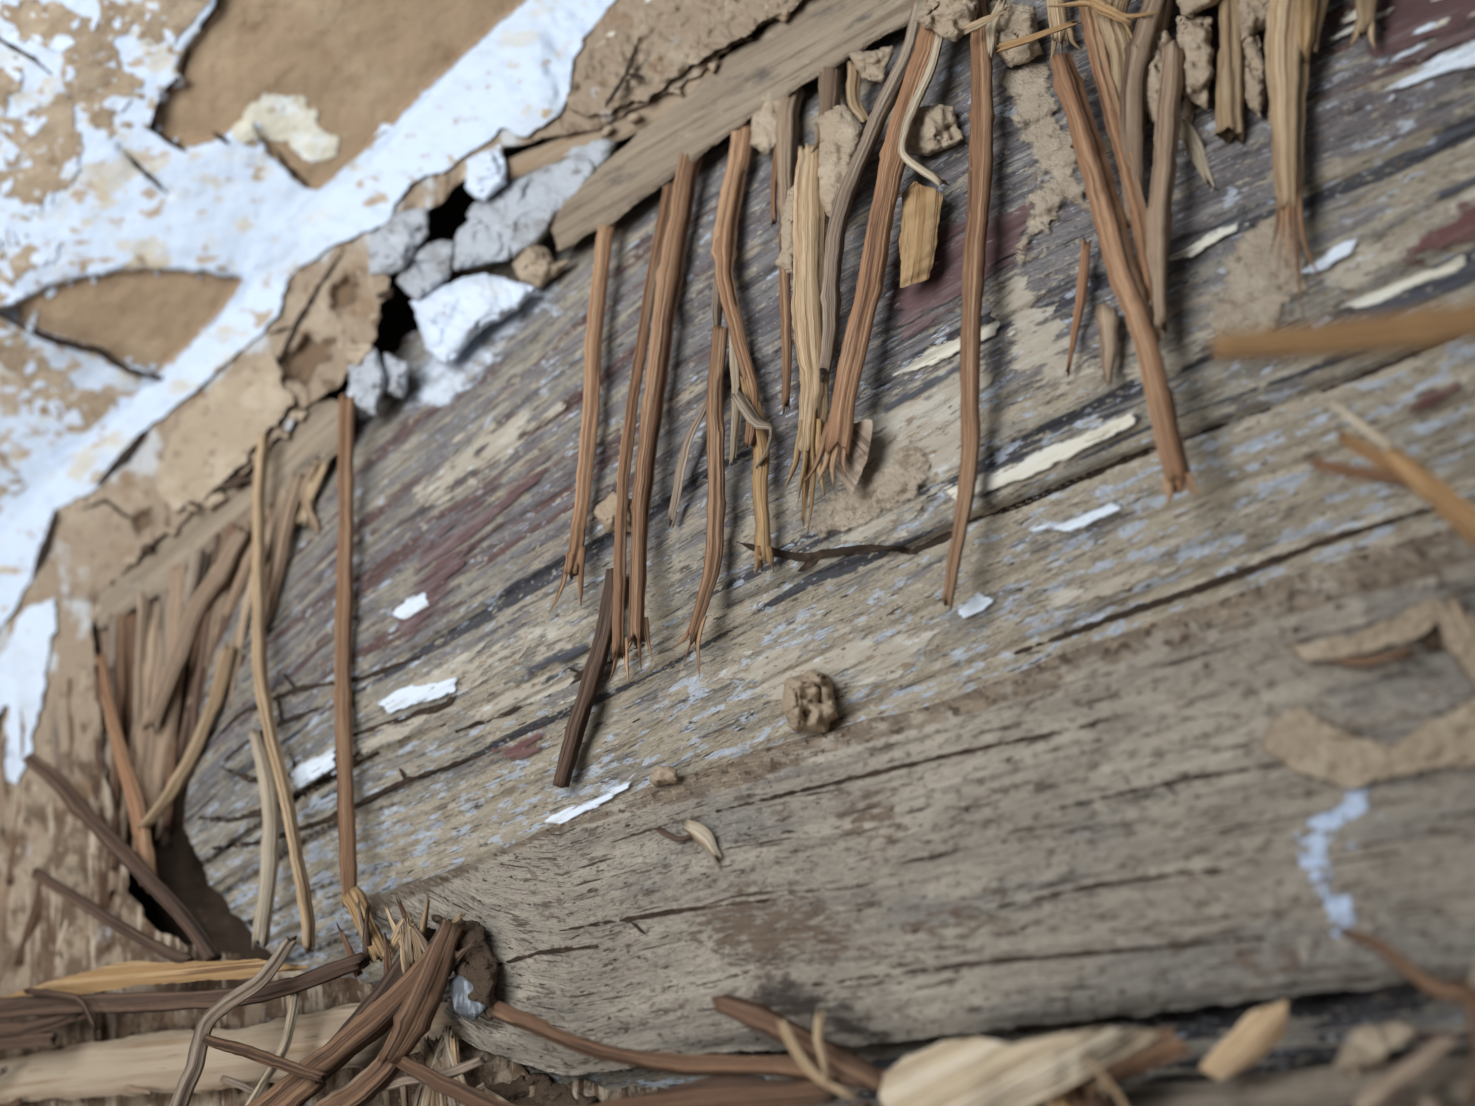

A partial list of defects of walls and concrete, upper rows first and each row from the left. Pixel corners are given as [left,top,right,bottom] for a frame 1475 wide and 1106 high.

spalling [0,0,526,433]
peeling [0,433,24,497]
peeling [0,598,56,784]
spalling [1415,622,1444,654]